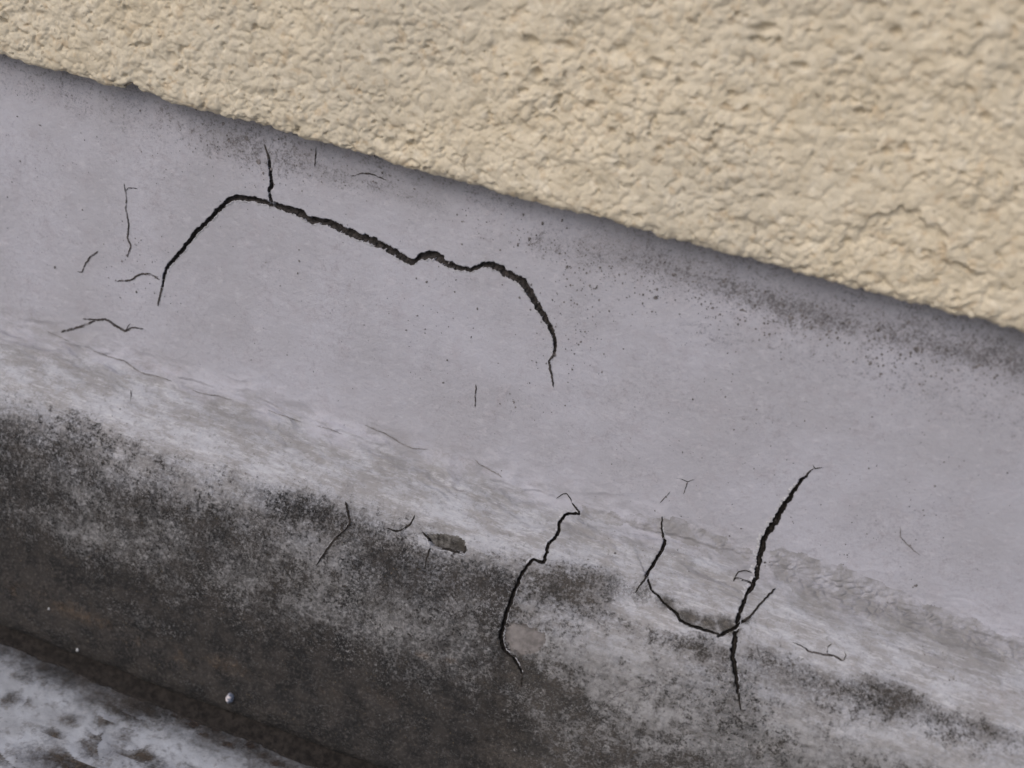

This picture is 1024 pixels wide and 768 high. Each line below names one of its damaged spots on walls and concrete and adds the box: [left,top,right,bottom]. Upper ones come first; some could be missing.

crack [48,318,143,341]
crack [94,351,232,400]
crack [117,144,557,387]
leakage [499,205,1024,410]
crack [316,501,351,565]
spalling [427,533,466,552]
leakage [0,399,1017,768]
crack [499,493,580,688]
crack [635,465,822,711]
crack [793,642,846,661]